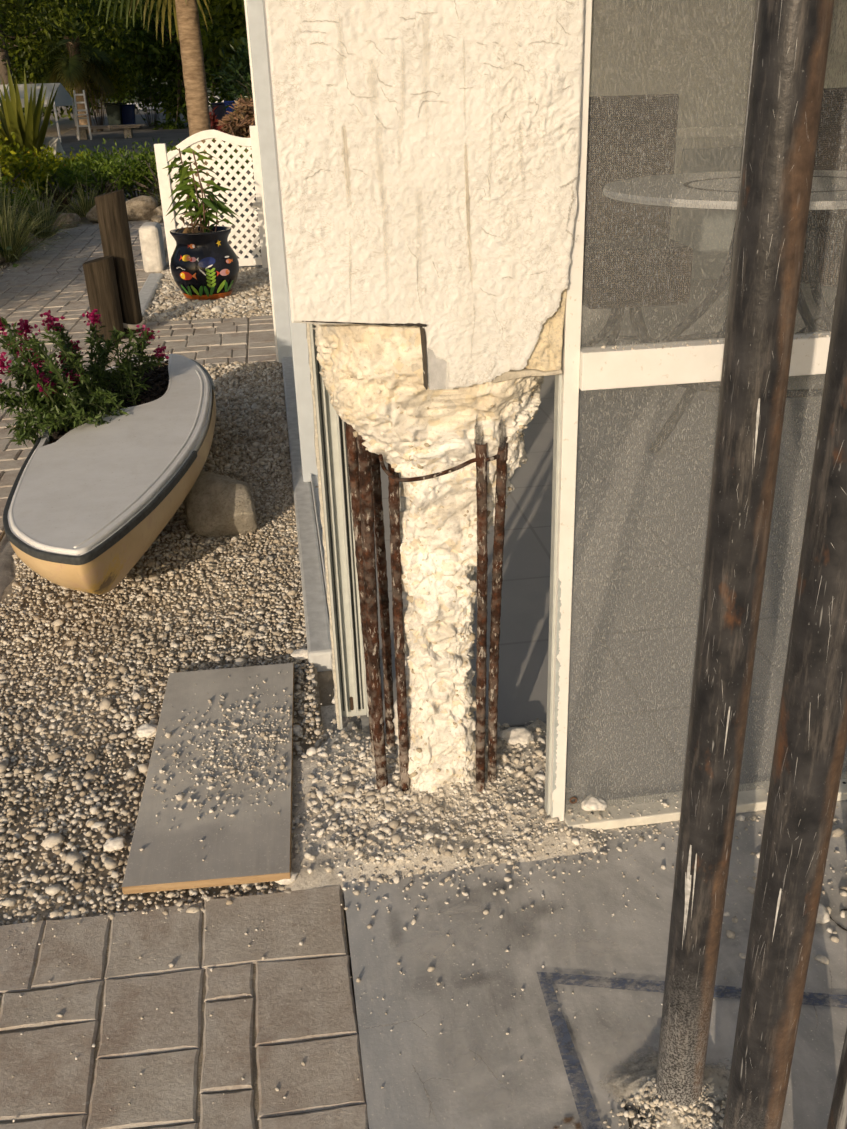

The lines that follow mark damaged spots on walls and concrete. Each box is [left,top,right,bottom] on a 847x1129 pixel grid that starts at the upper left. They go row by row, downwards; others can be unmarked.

crack [302,321,428,390]
corrosion [474,420,484,445]
spalling [313,288,568,818]